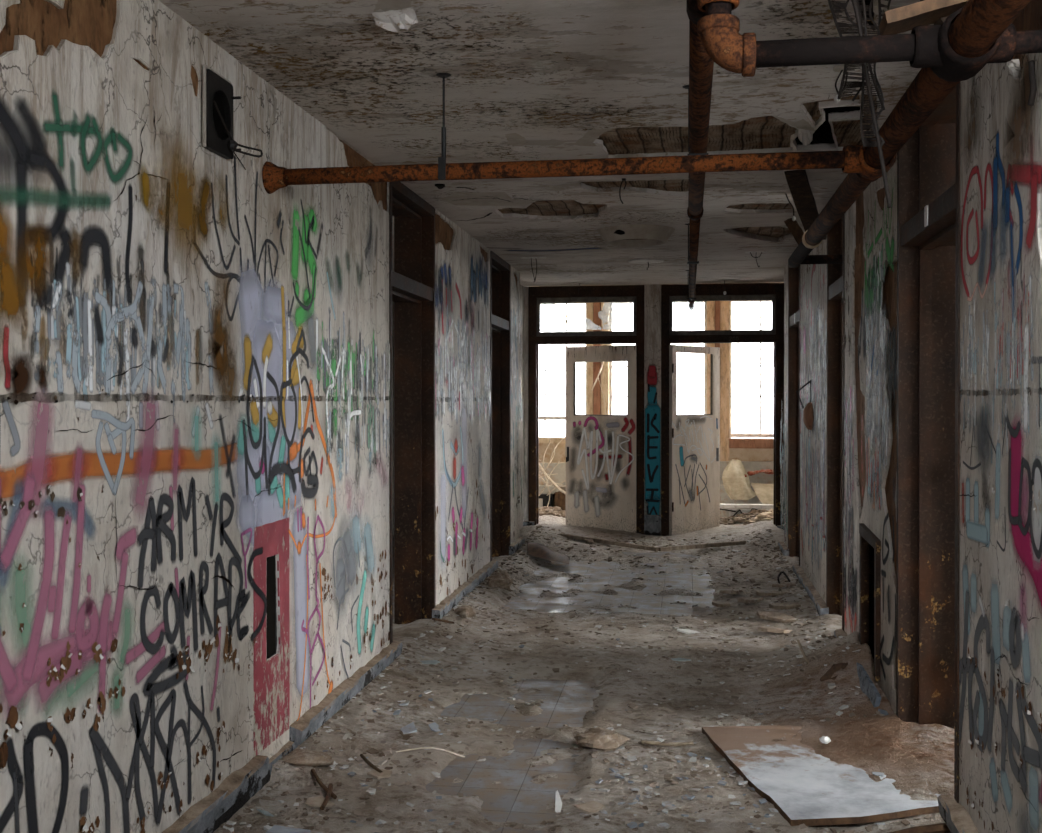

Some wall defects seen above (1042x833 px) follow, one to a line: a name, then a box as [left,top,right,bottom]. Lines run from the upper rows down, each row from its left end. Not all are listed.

spalling [0,0,122,60]
water stain [204,12,671,161]